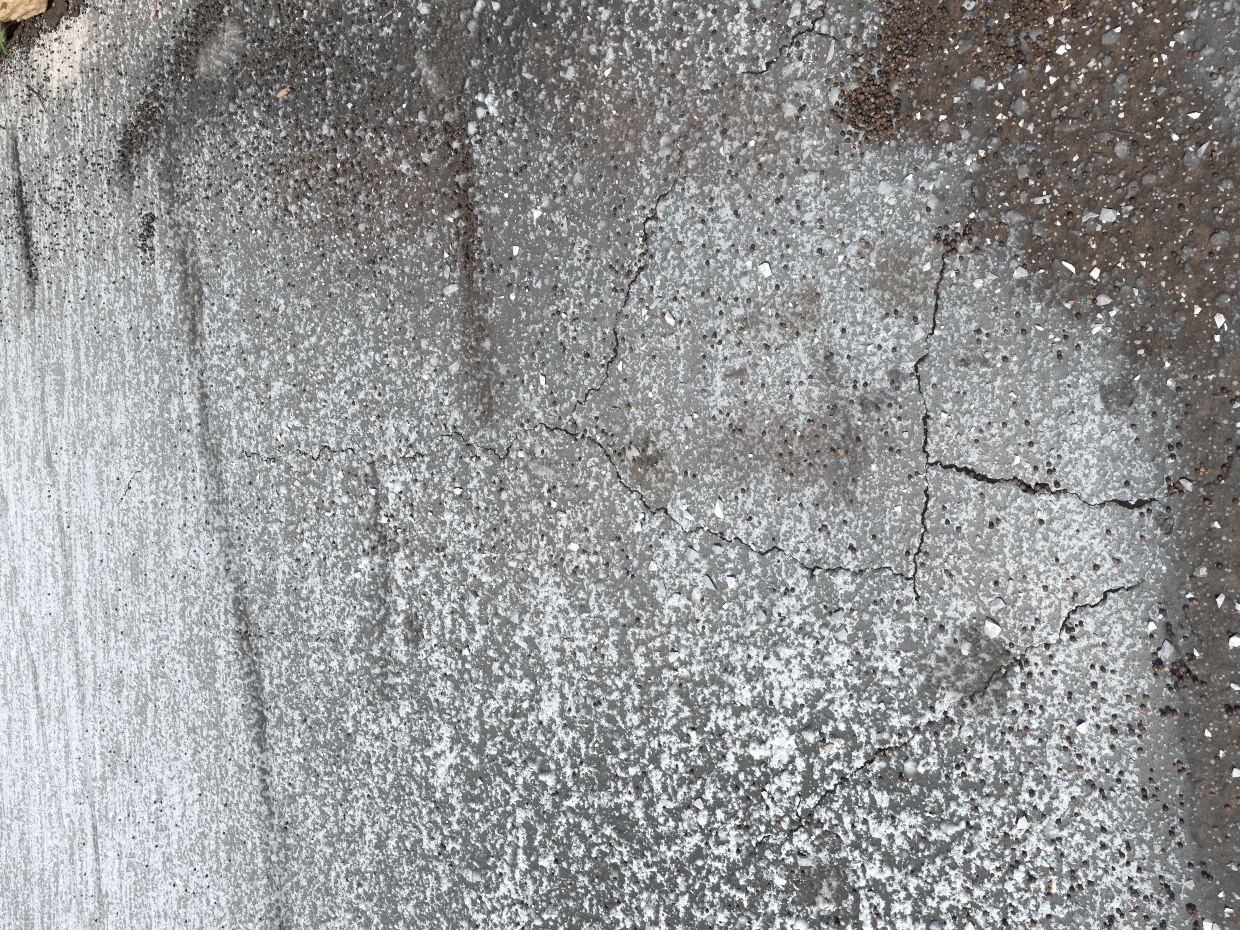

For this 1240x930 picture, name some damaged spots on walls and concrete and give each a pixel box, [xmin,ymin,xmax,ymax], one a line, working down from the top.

crack [238,136,1236,605]
crack [753,580,1141,852]